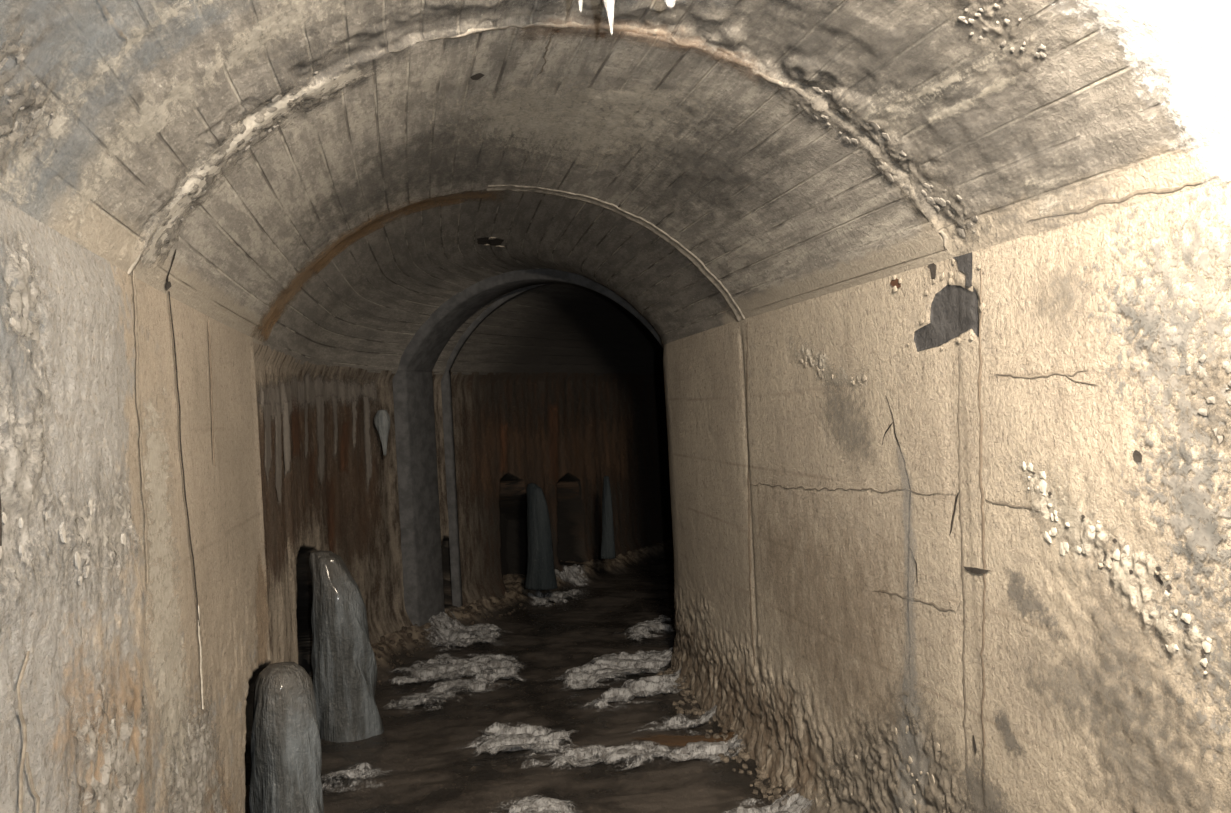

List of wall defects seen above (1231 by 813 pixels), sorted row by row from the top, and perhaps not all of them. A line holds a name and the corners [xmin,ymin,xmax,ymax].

water stain [69,0,349,237]
water stain [141,5,458,267]
peeling [778,0,1049,352]
water stain [751,0,1089,185]
crack [0,494,8,546]
crack [166,250,204,709]
rust [258,381,383,589]
crack [750,395,1041,743]
water stain [1008,568,1062,639]
crack [996,369,1097,385]
water stain [1026,0,1231,813]
water stain [995,710,1027,764]